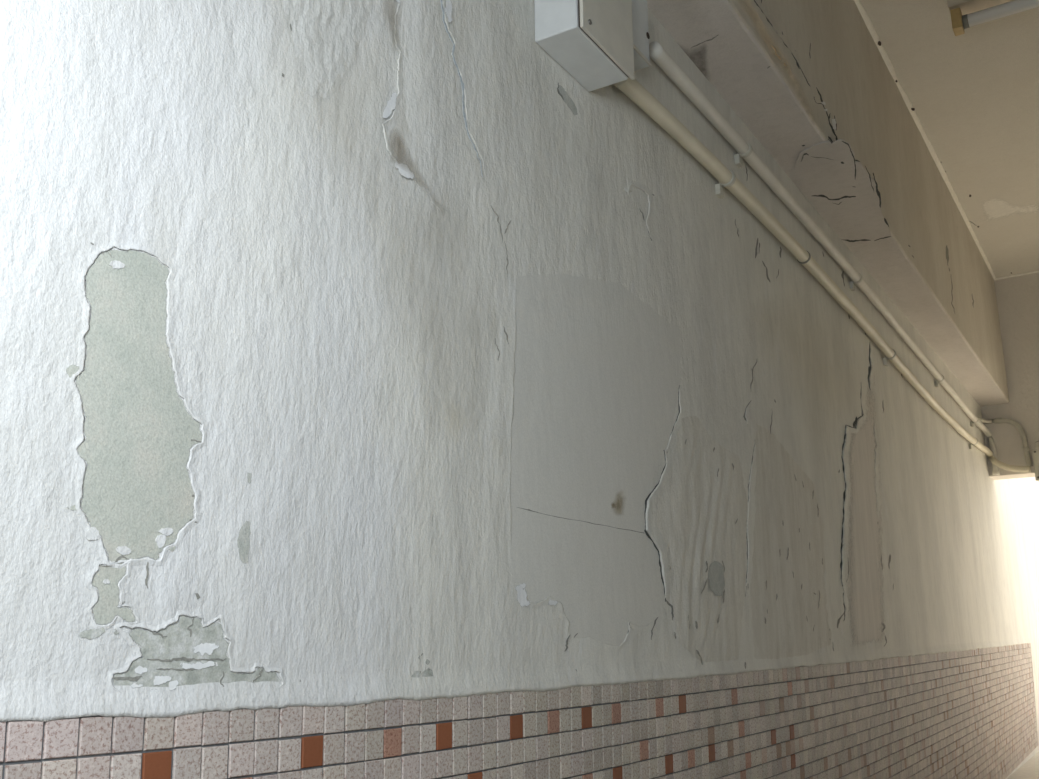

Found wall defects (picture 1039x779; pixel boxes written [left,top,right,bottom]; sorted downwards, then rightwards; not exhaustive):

crack [754,0,914,258]
crack [946,245,974,313]
peeling [66,241,286,693]
crack [517,385,690,640]
crack [829,342,894,651]